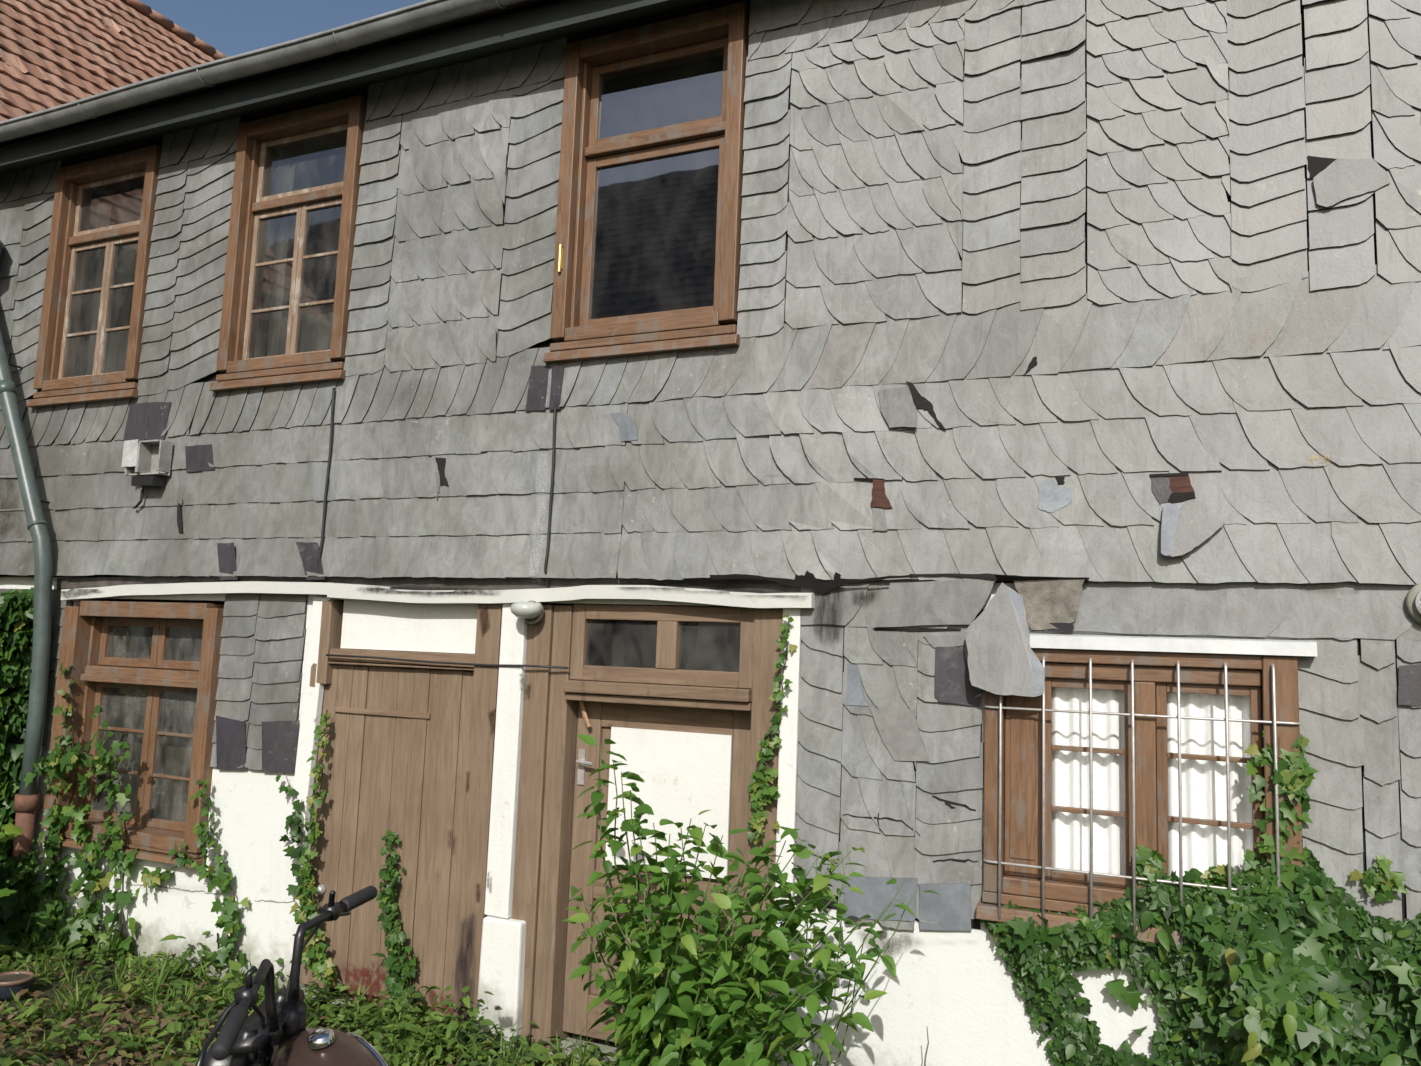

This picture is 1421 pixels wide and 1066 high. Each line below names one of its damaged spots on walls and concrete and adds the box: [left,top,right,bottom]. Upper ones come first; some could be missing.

peeling [1161,502,1184,557]
peeling [924,634,966,648]
spalling [995,575,1088,695]